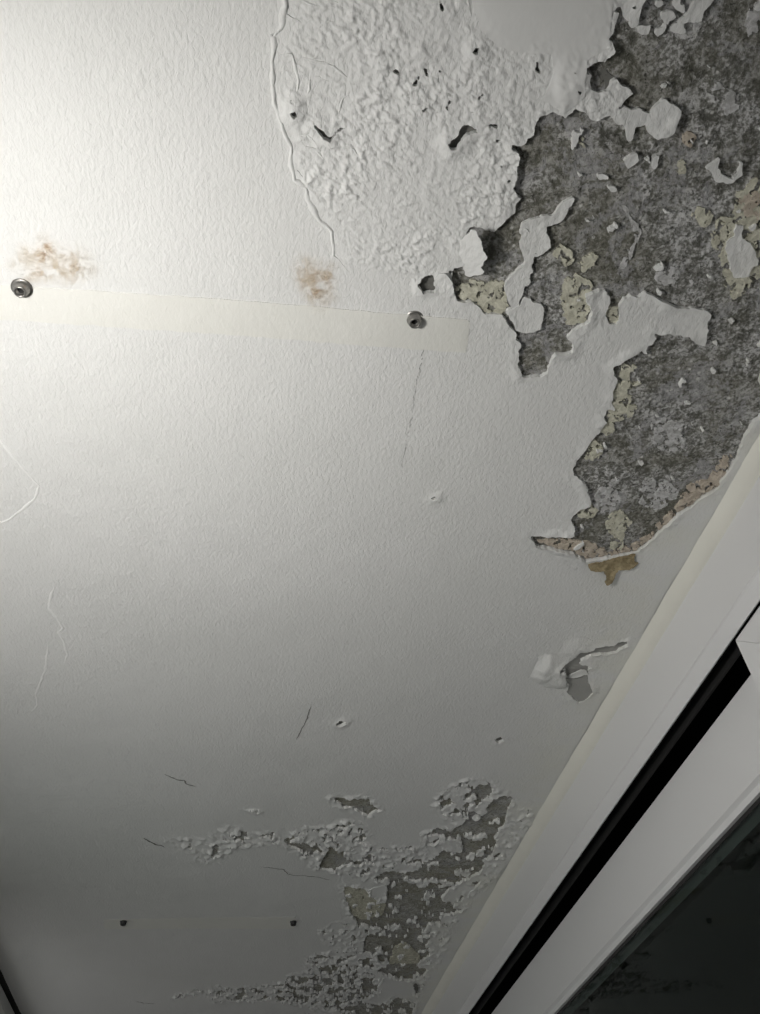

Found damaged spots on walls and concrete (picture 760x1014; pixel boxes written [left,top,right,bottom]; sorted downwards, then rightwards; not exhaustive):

crack [269,0,348,271]
spalling [434,0,760,586]
peeling [564,642,627,702]
spalling [217,783,512,1014]